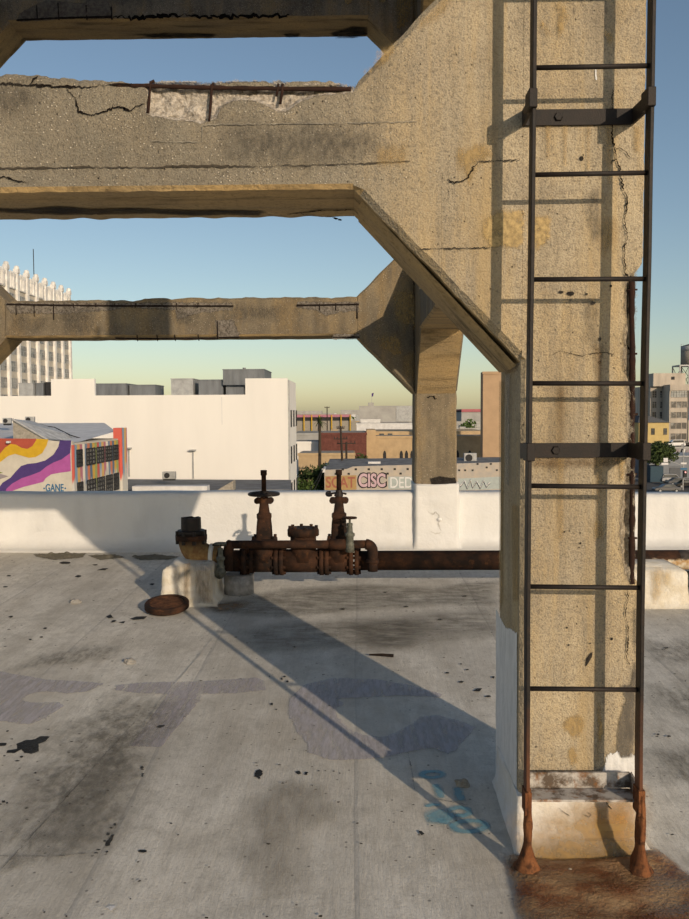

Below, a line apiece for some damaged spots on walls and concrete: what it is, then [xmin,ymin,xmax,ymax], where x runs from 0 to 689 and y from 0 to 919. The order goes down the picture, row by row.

spalling [16,0,113,22]
crack [112,13,289,21]
crack [0,76,145,116]
spalling [112,79,356,124]
crack [611,90,631,276]
rust [508,806,689,919]